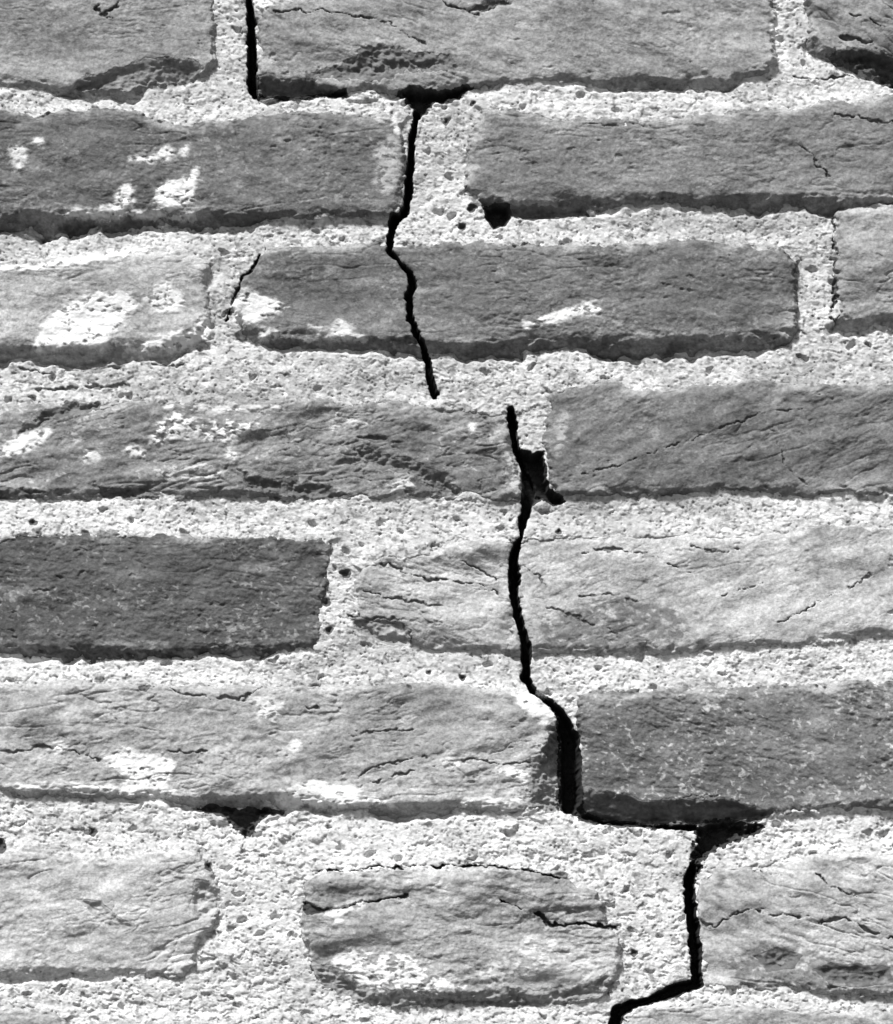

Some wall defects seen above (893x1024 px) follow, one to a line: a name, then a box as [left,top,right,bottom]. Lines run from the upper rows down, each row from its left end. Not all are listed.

crack [443,0,511,16]
crack [245,0,427,101]
crack [588,121,651,129]
crack [225,240,266,322]
crack [386,84,475,400]
crack [347,405,893,1024]
crack [302,863,560,915]